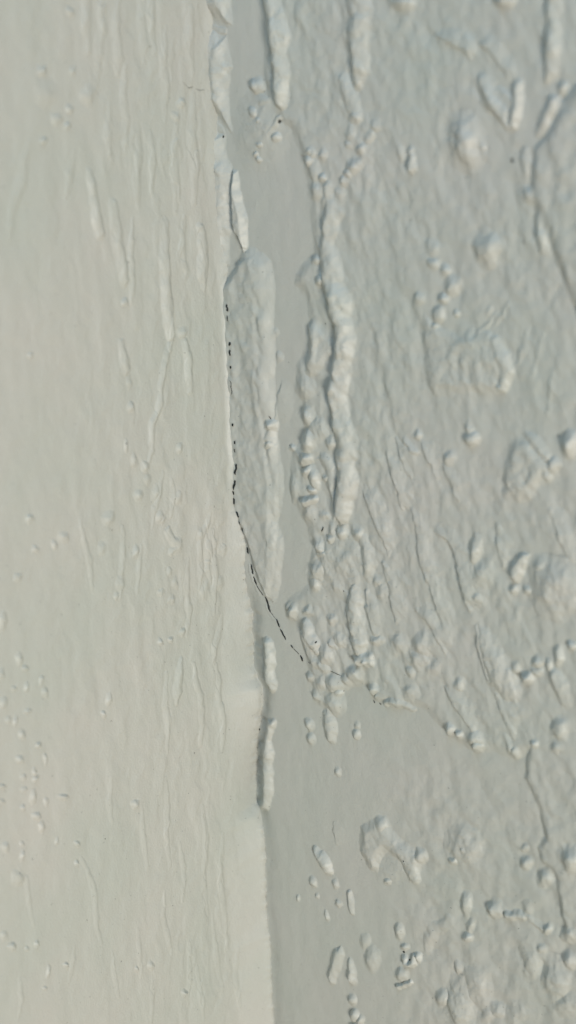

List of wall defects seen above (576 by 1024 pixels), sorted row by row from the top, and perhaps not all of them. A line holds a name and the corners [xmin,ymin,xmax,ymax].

crack [232,423,341,676]